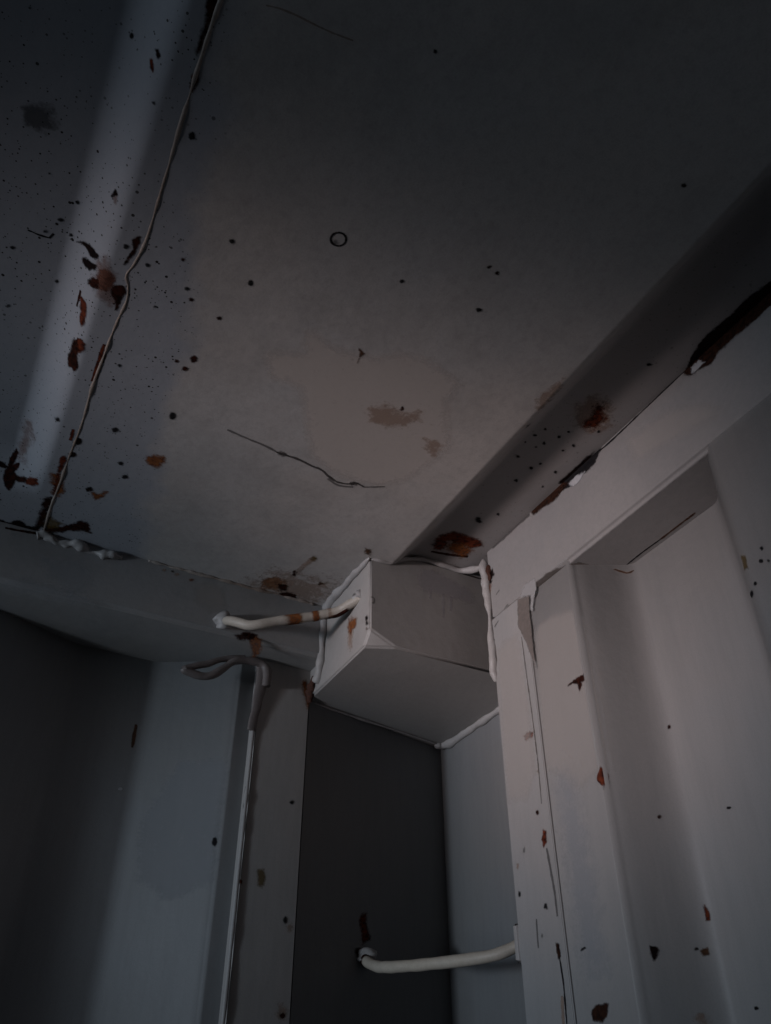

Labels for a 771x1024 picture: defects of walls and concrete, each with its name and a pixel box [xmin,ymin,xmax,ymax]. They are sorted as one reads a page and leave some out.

corrosion [123,236,141,265]
corrosion [76,241,126,326]
peeling [684,281,771,376]
corrosion [67,338,85,371]
corrosion [91,344,106,381]
corrosion [0,429,92,535]
corrosion [145,455,165,467]
crack [276,451,364,487]
peeling [531,448,601,515]
corrosion [431,531,482,558]
corrosion [262,571,296,598]
corrosion [591,1003,608,1022]